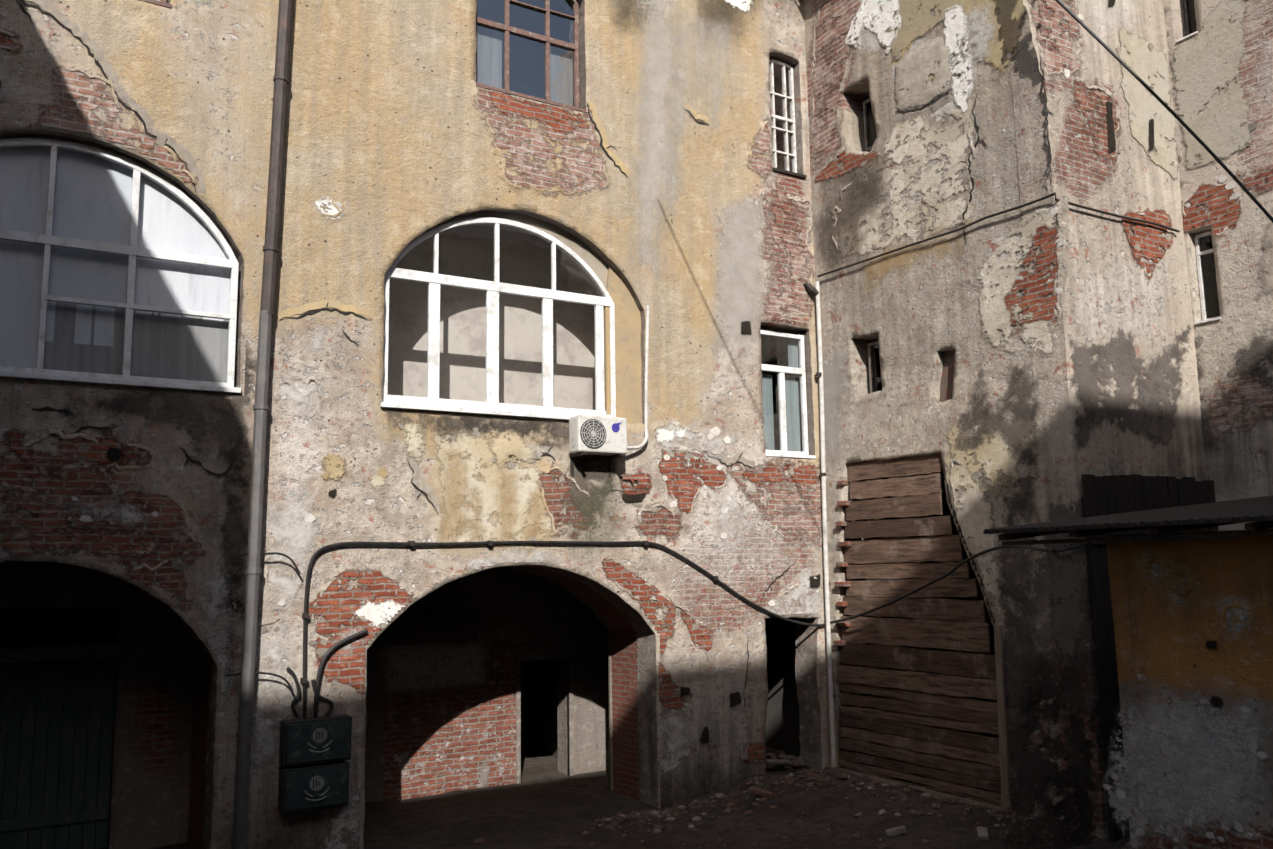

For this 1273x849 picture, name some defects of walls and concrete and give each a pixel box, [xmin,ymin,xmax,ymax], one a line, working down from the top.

crack [16,0,207,193]
flaking render [30,63,199,186]
flaking render [472,87,612,198]
flaking render [809,0,1123,258]
flaking render [741,116,815,334]
flaking render [977,198,1069,355]
flaking render [1121,164,1273,281]
water stain [1070,326,1219,452]
water stain [1227,329,1273,391]
flaking render [617,418,823,549]
flaking render [252,489,415,769]
flaking render [602,559,713,776]